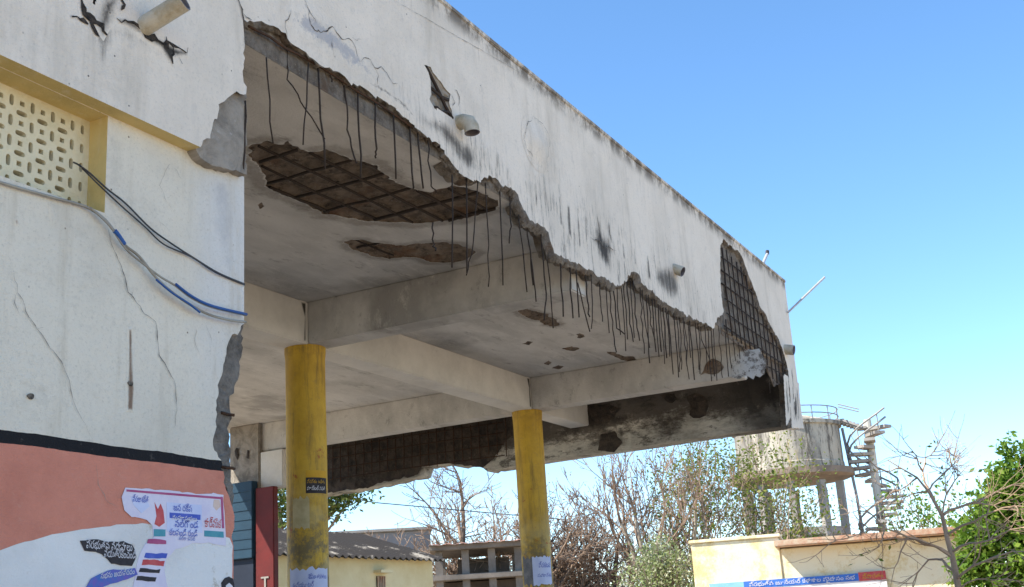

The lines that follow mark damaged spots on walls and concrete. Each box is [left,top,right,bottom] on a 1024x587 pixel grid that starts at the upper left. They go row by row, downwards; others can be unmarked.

crack [285,3,397,84]
damp [201,89,684,309]
spalling [236,0,792,430]
crack [13,271,84,422]
corrosion [125,326,136,414]
spalling [327,417,514,493]
damp [550,398,650,454]
spalling [587,403,622,452]